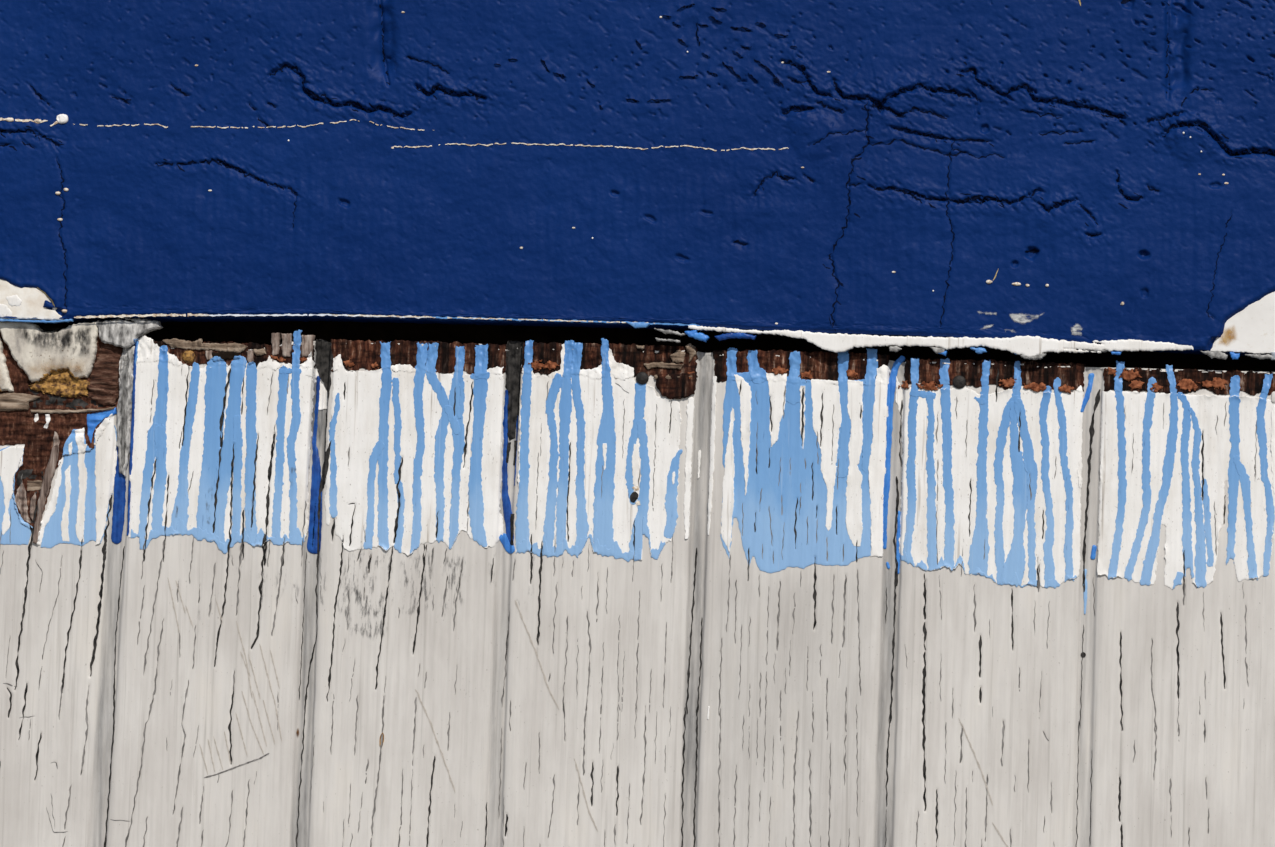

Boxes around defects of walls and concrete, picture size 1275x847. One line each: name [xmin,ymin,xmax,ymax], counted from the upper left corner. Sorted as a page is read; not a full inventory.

crack [0,1,1275,331]
peeling [0,279,1194,357]
peeling [1210,292,1275,354]
peeling [0,446,24,535]
peeling [37,335,207,545]
peeling [218,344,752,560]
crack [0,339,1248,847]
peeling [766,365,1084,587]
peeling [1097,367,1275,589]